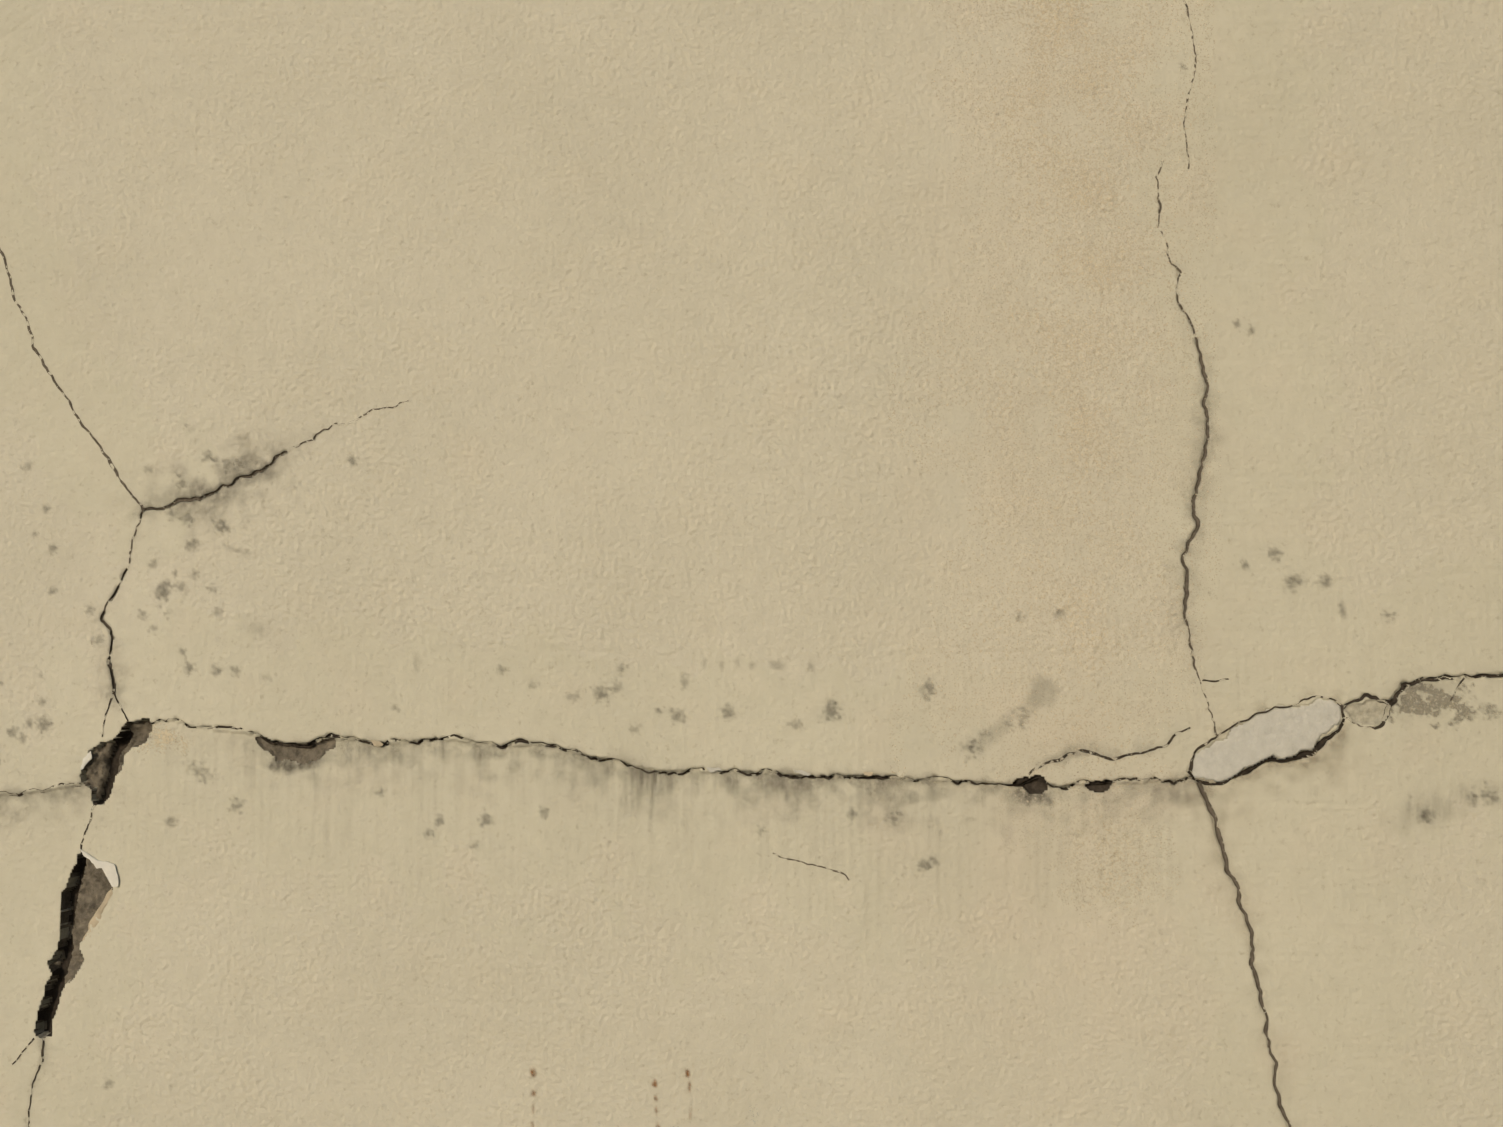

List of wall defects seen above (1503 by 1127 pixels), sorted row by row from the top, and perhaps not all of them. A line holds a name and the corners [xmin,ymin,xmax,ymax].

crack [1183,1,1197,169]
spalling [80,718,192,805]
crack [0,160,1291,1127]
peeling [1188,683,1475,785]
crack [1387,674,1503,707]
spalling [34,849,119,1038]